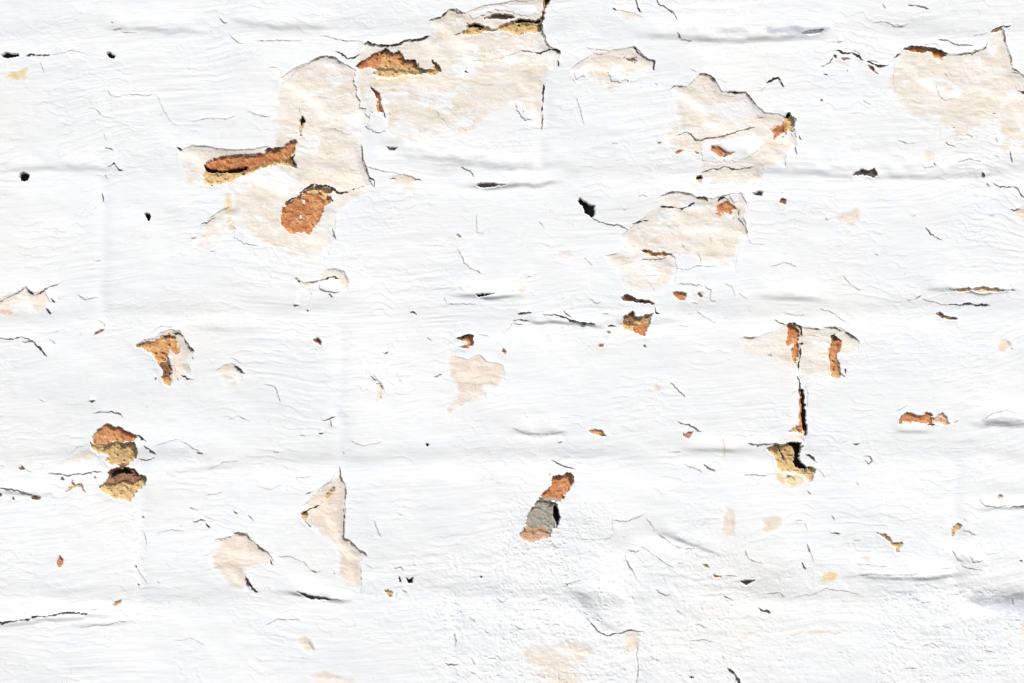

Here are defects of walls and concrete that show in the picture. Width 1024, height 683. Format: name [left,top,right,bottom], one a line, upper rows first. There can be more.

peeling [177,0,656,260]
peeling [868,25,1024,165]
peeling [598,69,802,348]
flaking render [58,411,155,502]
flaking render [136,326,194,387]
peeling [207,532,273,592]
peeling [301,466,367,591]
peeling [435,334,506,418]
flaking render [519,460,574,543]
peeling [739,309,859,493]
crack [792,376,809,434]
flaking render [899,405,958,426]